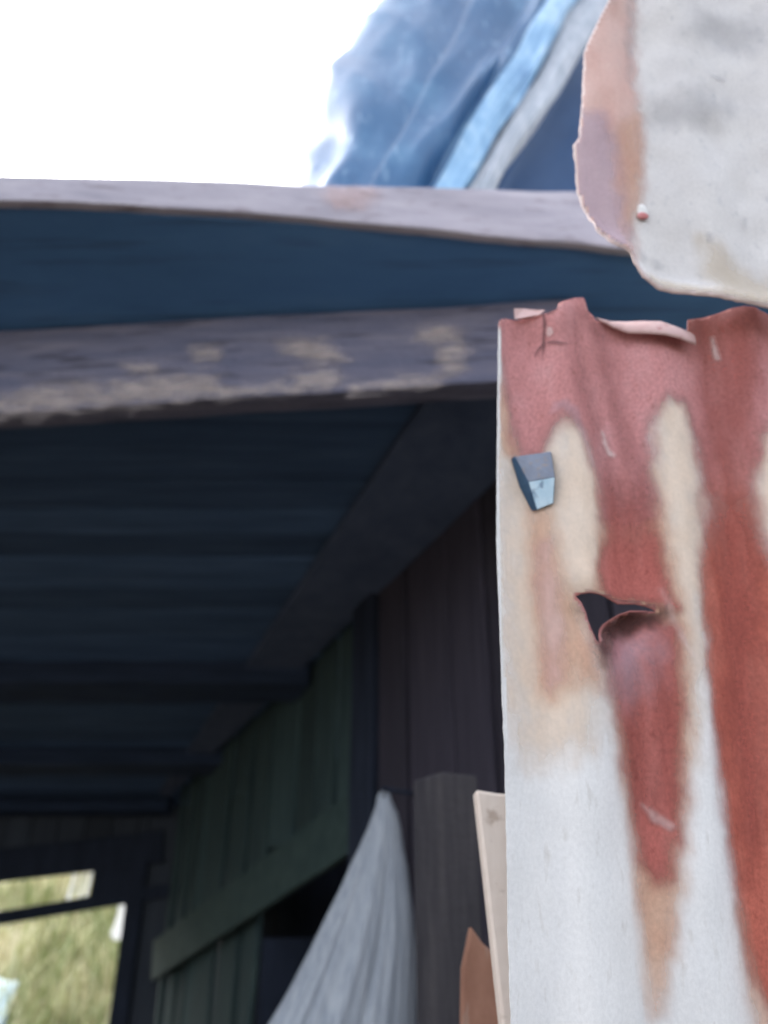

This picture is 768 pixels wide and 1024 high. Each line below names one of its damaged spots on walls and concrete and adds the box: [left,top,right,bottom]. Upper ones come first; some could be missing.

corrosion [576,0,641,253]
crack [535,309,564,355]
corrosion [500,297,768,1024]